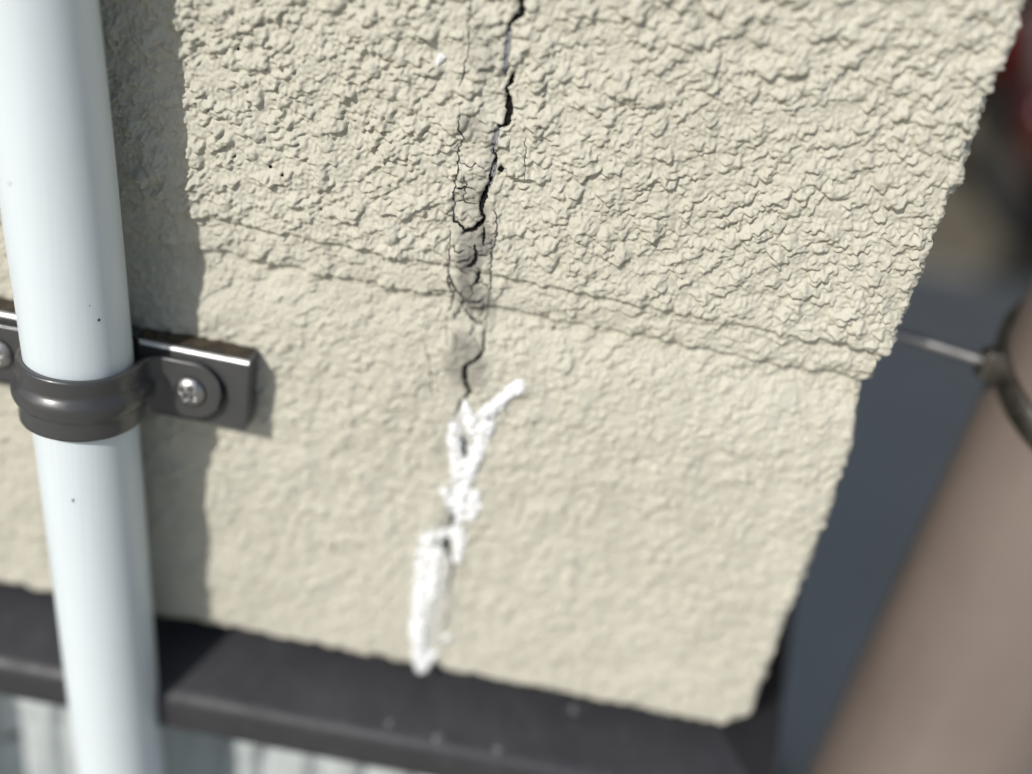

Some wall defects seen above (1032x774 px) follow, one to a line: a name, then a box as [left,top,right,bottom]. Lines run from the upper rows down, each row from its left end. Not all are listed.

crack [425,0,527,411]
crack [441,514,455,626]
crack [460,436,468,459]
efflorescence [405,380,525,673]